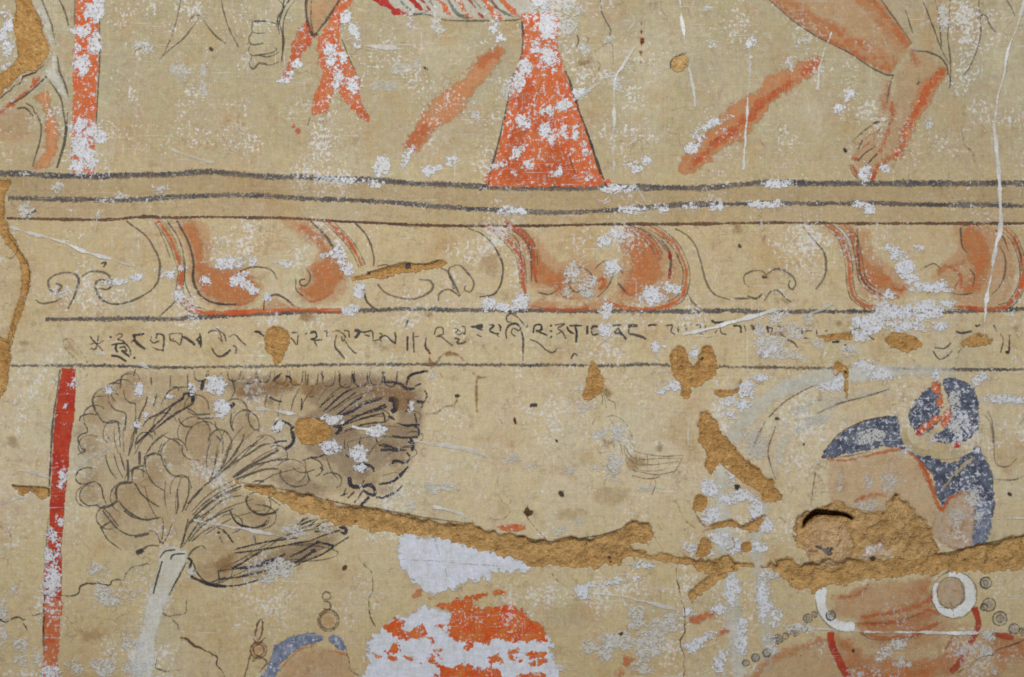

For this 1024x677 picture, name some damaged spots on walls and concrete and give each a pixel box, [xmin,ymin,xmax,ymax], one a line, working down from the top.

spalling [0,0,50,95]
spalling [0,171,35,396]
spalling [320,241,447,316]
spalling [12,468,68,499]
spalling [264,326,290,365]
spalling [574,360,604,414]
spalling [649,340,783,558]
spalling [752,238,959,431]
peeling [846,428,885,445]
spalling [793,466,940,561]
peeling [895,369,1024,454]
peeling [361,533,575,677]